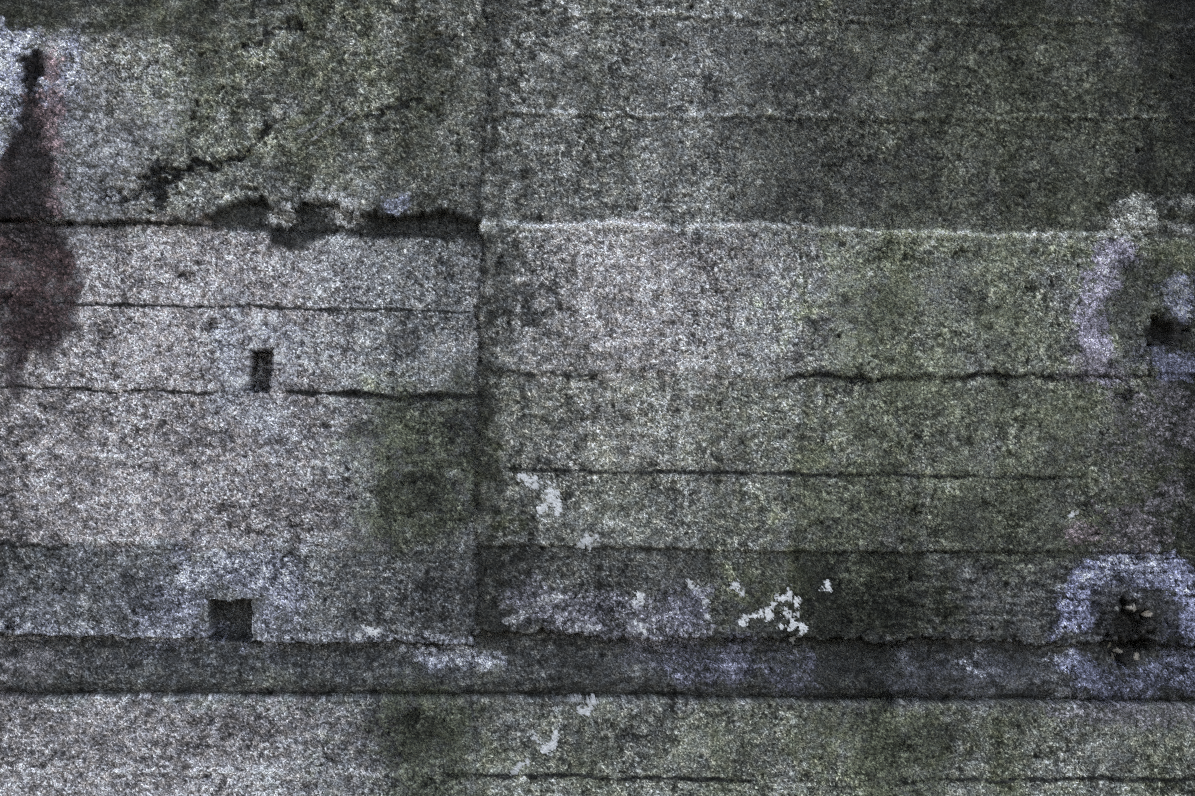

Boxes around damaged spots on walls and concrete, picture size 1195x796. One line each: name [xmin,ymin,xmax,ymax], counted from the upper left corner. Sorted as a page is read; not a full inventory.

rust [0,49,92,400]
spalling [208,187,480,250]
damp [1071,236,1195,456]
damp [503,584,816,691]
damp [931,465,1195,731]